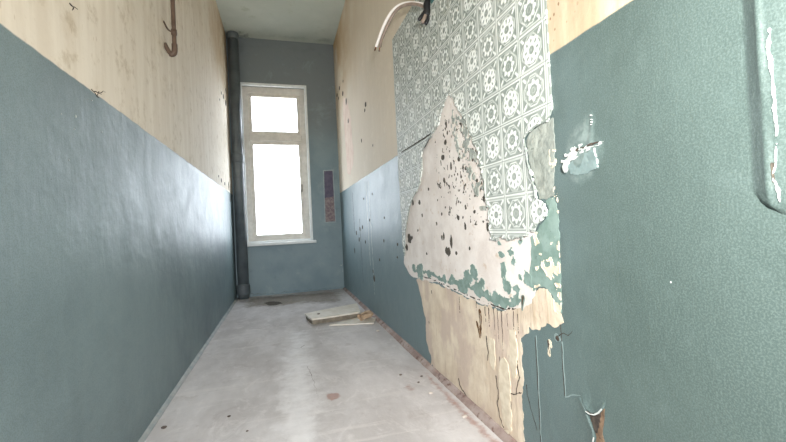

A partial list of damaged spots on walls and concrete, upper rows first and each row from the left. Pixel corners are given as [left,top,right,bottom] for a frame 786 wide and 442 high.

spalling [549,107,606,191]
peeling [397,94,564,442]
spalling [567,353,609,442]